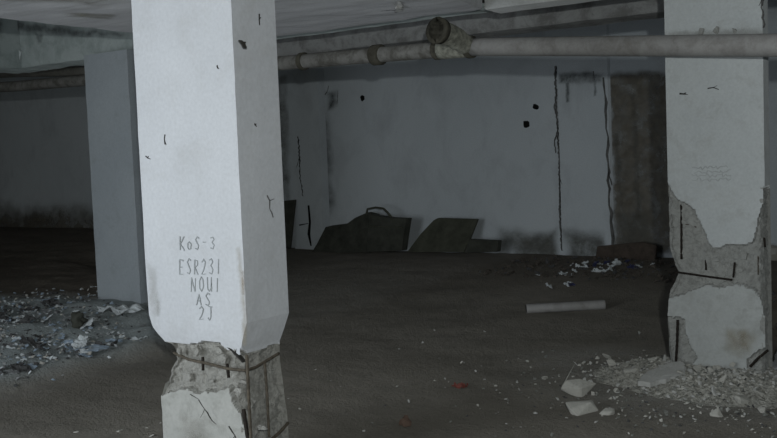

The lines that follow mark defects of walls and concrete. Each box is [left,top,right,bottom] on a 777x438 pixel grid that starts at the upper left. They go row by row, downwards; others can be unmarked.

crack [758,0,766,28]
crack [553,66,563,251]
water stain [0,211,94,229]
spalling [668,185,777,372]
spalling [161,341,289,438]